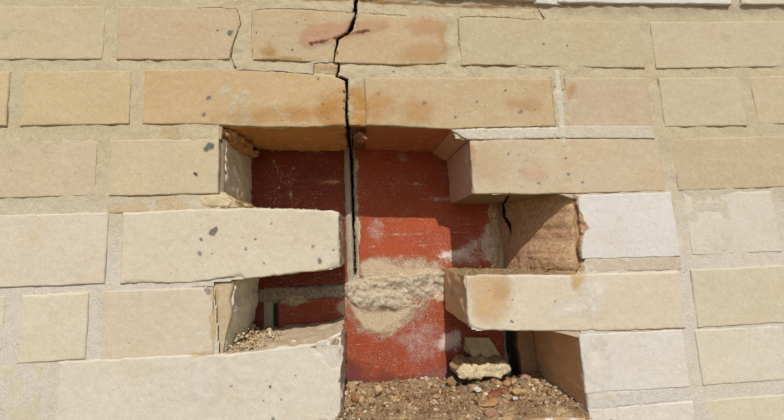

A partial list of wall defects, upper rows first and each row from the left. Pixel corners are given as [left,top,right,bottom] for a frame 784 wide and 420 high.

crack [457,7,545,46]
crack [460,62,549,70]
crack [202,0,406,275]
spalling [500,197,583,273]